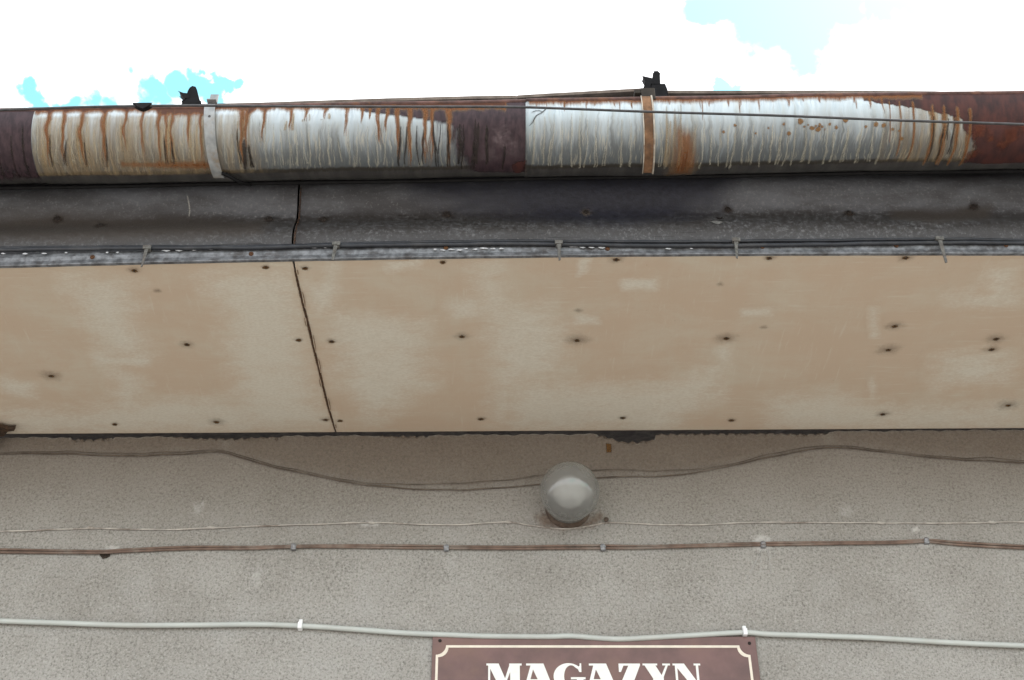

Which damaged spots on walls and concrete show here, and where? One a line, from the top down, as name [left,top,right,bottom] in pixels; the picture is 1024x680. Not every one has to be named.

corrosion [0,94,1024,180]